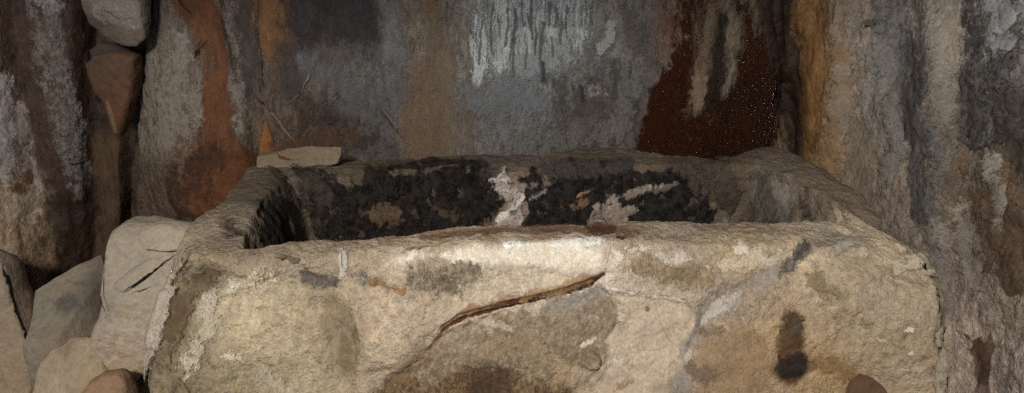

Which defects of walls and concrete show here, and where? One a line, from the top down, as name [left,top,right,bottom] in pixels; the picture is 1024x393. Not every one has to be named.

leakage [387,0,813,297]
crack [124,254,176,293]
crack [408,243,611,367]